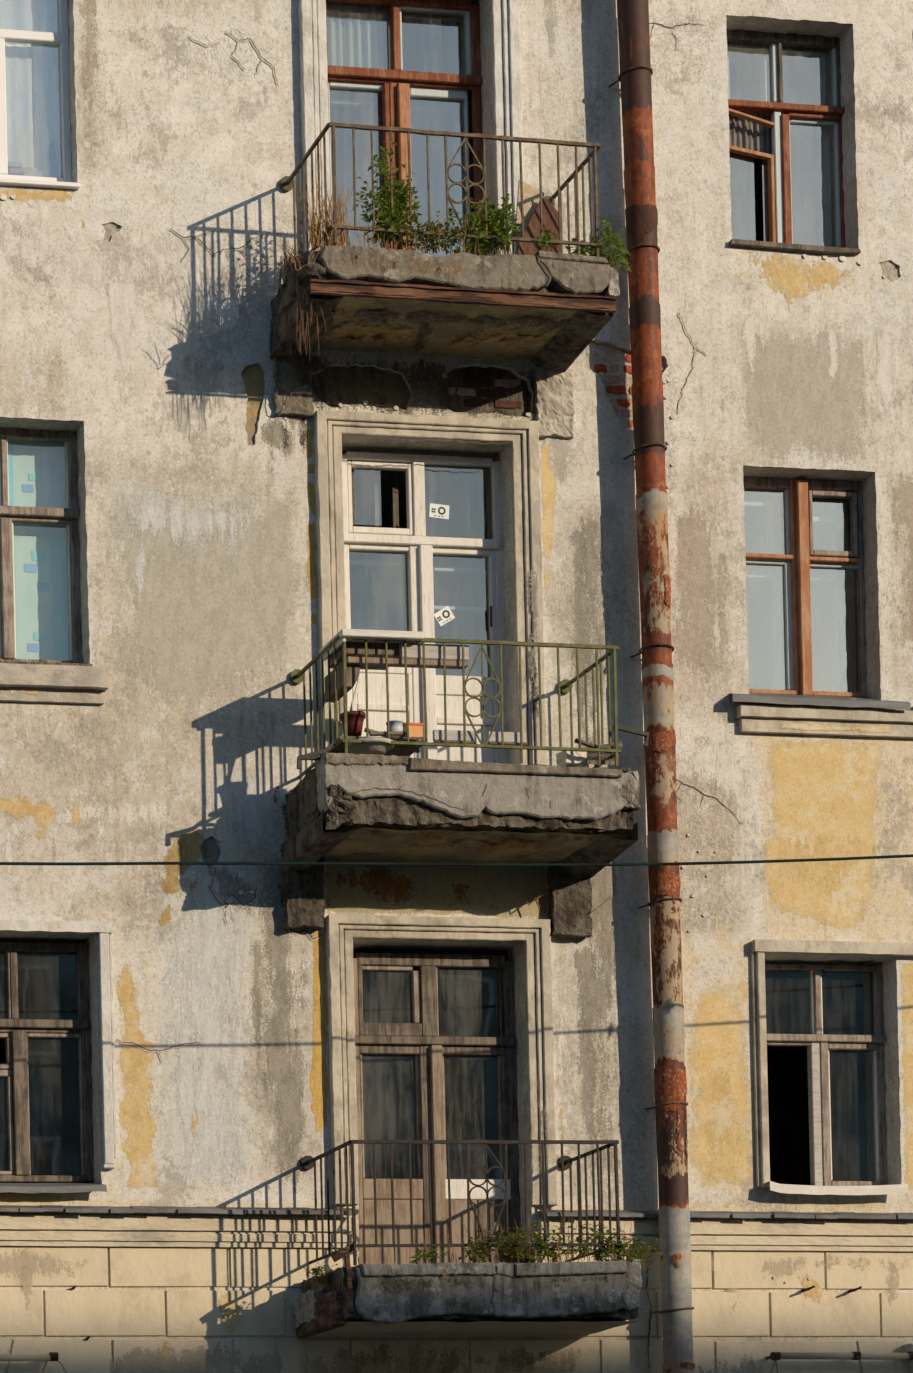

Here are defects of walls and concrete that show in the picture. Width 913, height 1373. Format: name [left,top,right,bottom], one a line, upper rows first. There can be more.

crack [187,31,278,86]
crack [169,228,270,262]
rust [626,205,658,250]
spalling [241,362,269,446]
spalling [311,365,411,410]
spalling [435,366,531,417]
spalling [585,341,633,430]
rust [642,521,671,606]
peeling [775,832,870,895]
rust [652,872,681,966]
crack [116,1039,200,1063]
rust [659,1068,688,1164]